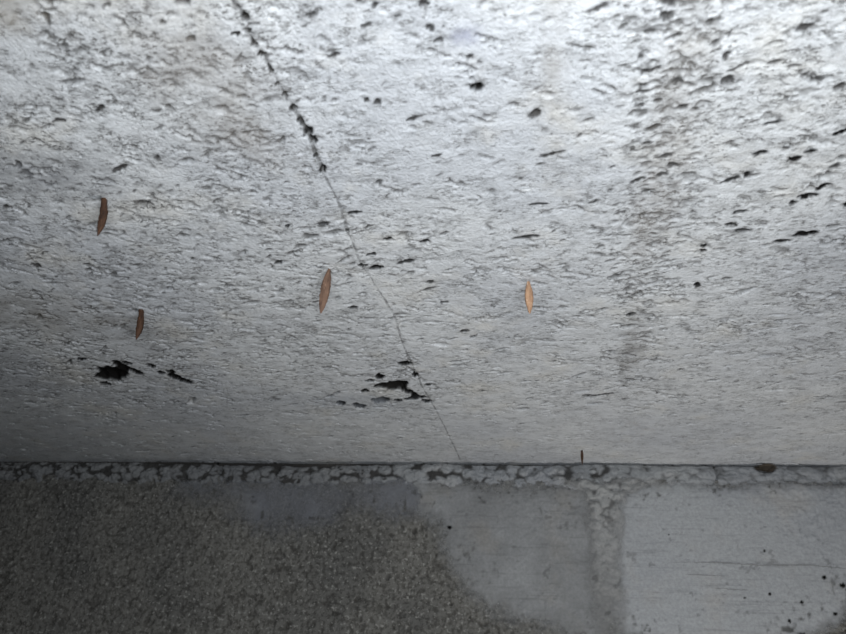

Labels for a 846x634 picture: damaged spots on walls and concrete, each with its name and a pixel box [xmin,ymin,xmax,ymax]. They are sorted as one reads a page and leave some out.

crack [231,0,327,172]
spalling [94,360,192,385]
spalling [336,361,431,408]